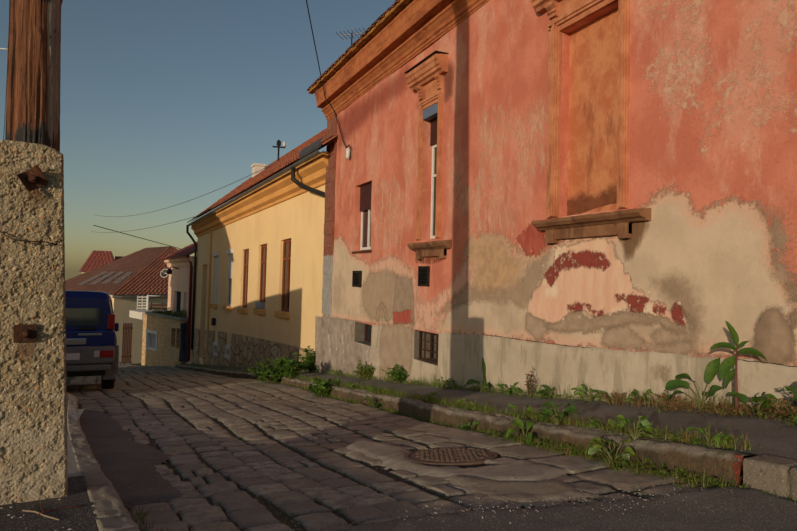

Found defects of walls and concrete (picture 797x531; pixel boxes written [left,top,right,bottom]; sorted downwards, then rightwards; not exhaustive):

flaking render [332,185,797,366]